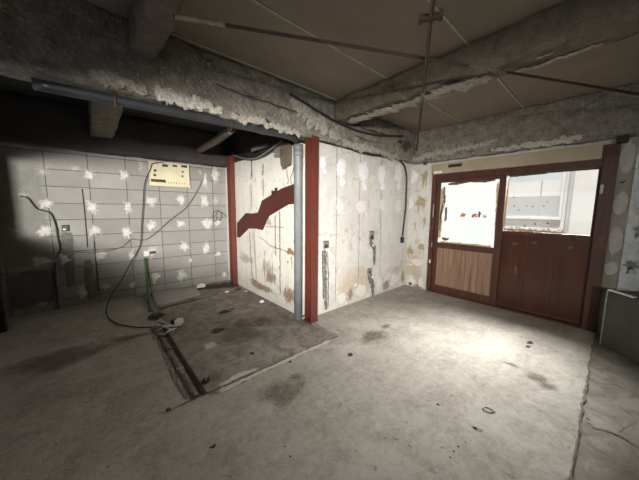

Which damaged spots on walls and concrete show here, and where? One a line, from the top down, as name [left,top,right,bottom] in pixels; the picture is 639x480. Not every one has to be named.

spalling [87,64,411,161]
spalling [347,75,493,124]
crack [568,342,636,480]